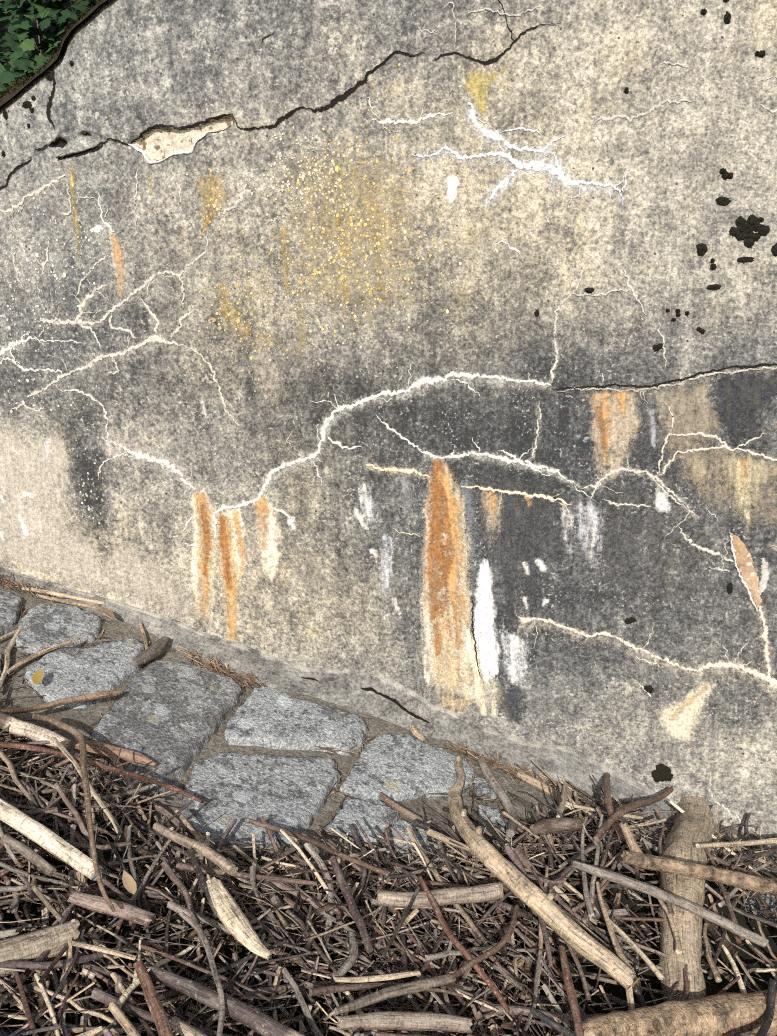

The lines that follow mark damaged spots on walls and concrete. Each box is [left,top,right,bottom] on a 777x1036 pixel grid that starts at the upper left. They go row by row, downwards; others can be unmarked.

spalling [128,117,233,163]
crack [0,0,777,572]
rust [590,391,641,479]
rust [652,384,777,528]
damp [354,484,378,530]
rust [190,490,281,642]
damp [369,536,401,615]
rust [419,459,480,713]
crack [471,600,480,675]
damp [460,468,715,724]
crack [517,606,777,697]
crack [361,687,430,723]